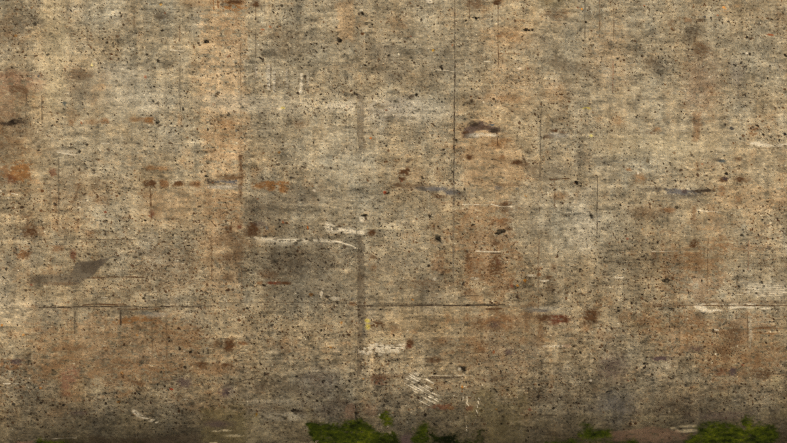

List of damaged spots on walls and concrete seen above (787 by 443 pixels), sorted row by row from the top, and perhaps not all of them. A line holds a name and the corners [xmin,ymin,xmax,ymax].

corrosion [0,0,293,403]
corrosion [350,0,602,389]
damp [131,409,159,424]
damp [208,429,282,443]